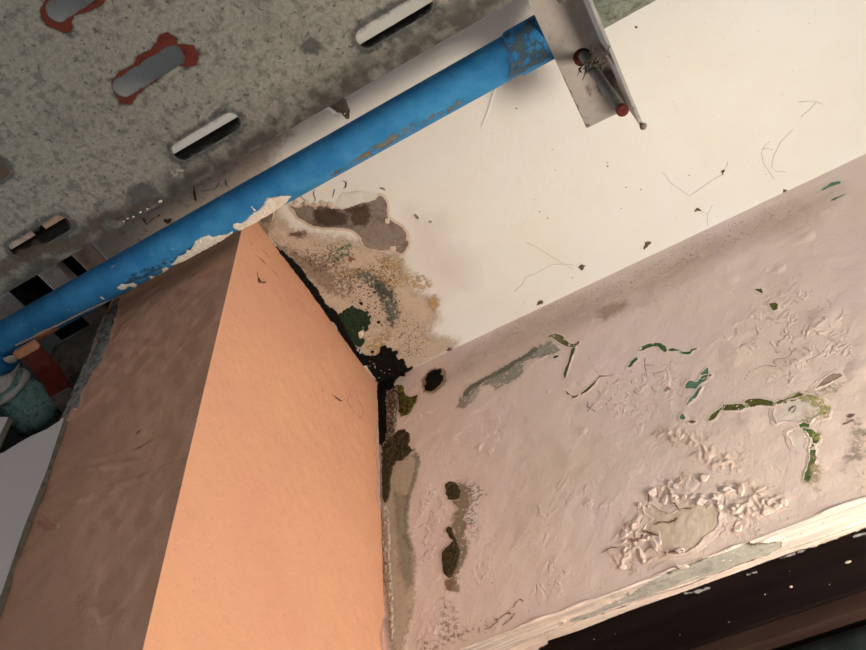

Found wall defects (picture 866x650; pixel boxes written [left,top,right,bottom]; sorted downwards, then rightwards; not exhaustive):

spalling [258,191,412,258]
leakage [264,218,456,446]
leakage [380,450,420,650]
peeling [558,411,791,626]
peeling [768,369,847,484]